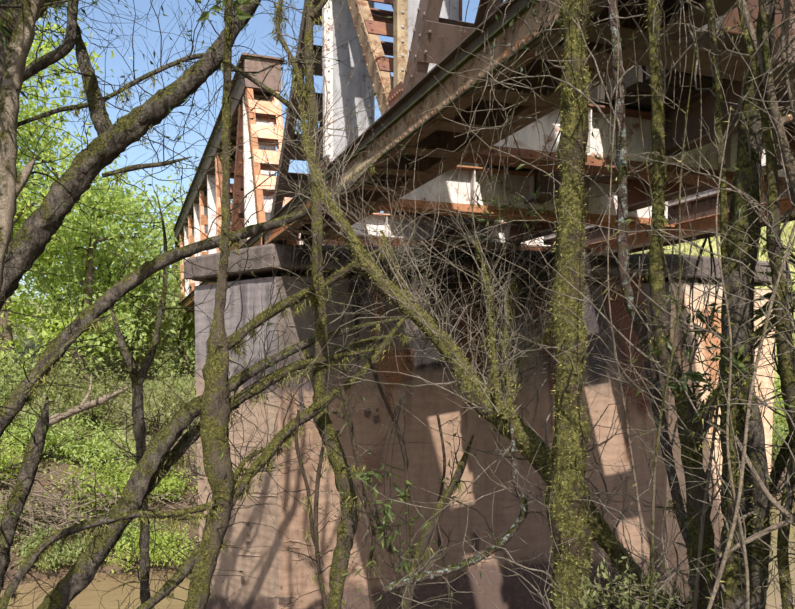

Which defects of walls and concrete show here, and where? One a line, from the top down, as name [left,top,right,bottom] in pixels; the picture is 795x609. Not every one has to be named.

corrosion [604,276,650,412]